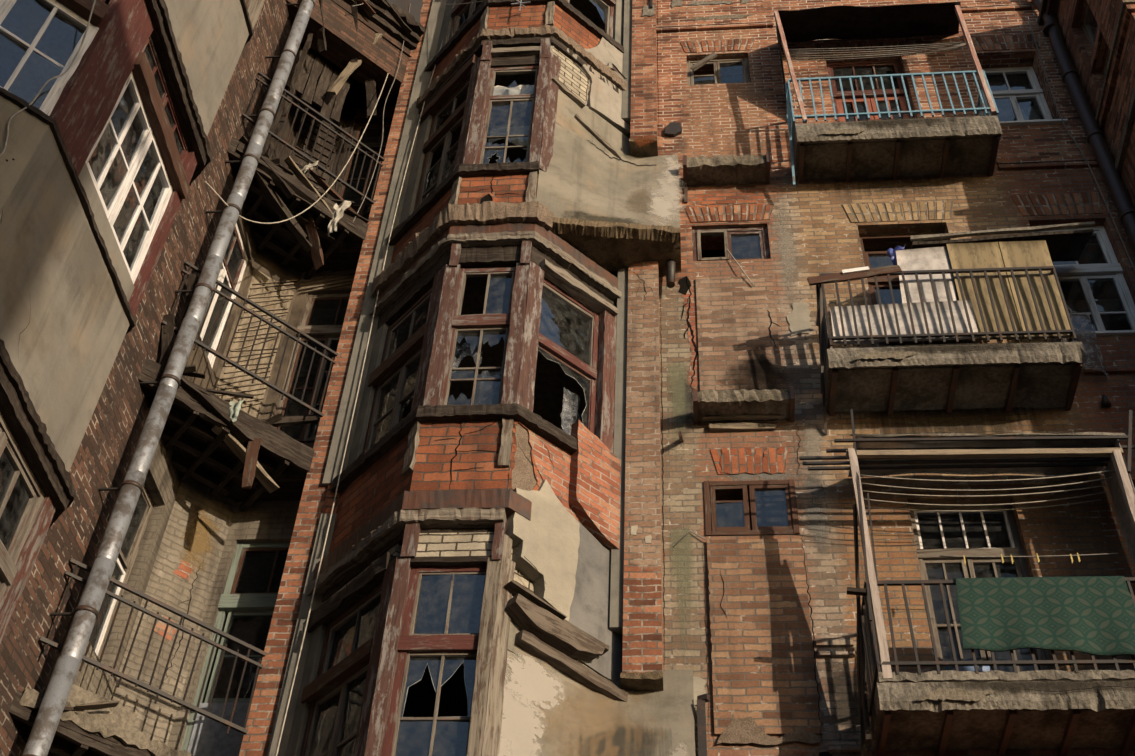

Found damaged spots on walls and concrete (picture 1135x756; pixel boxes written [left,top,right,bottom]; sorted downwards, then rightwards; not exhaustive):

peeling [649,156,683,224]
crack [767,310,779,347]
crack [435,422,557,497]
spalling [509,421,540,491]
crack [628,269,699,671]